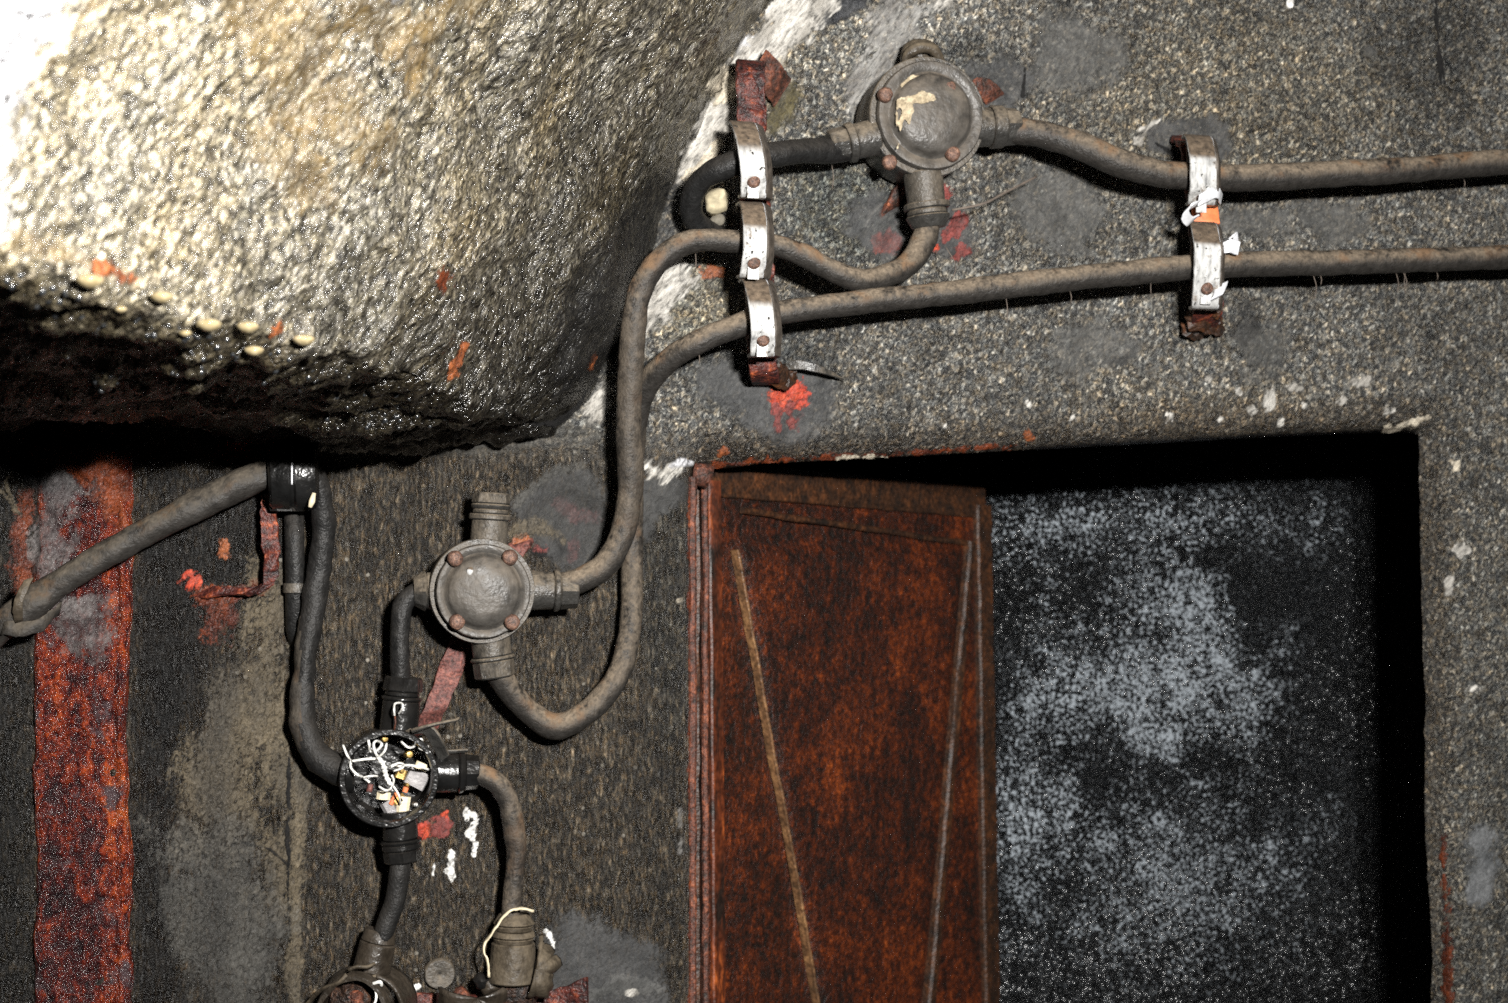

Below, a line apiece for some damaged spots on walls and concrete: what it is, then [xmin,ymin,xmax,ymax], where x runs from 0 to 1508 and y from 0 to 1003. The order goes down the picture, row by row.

corrosion [27,423,134,528]
corrosion [7,490,43,595]
damp [985,463,1361,1002]